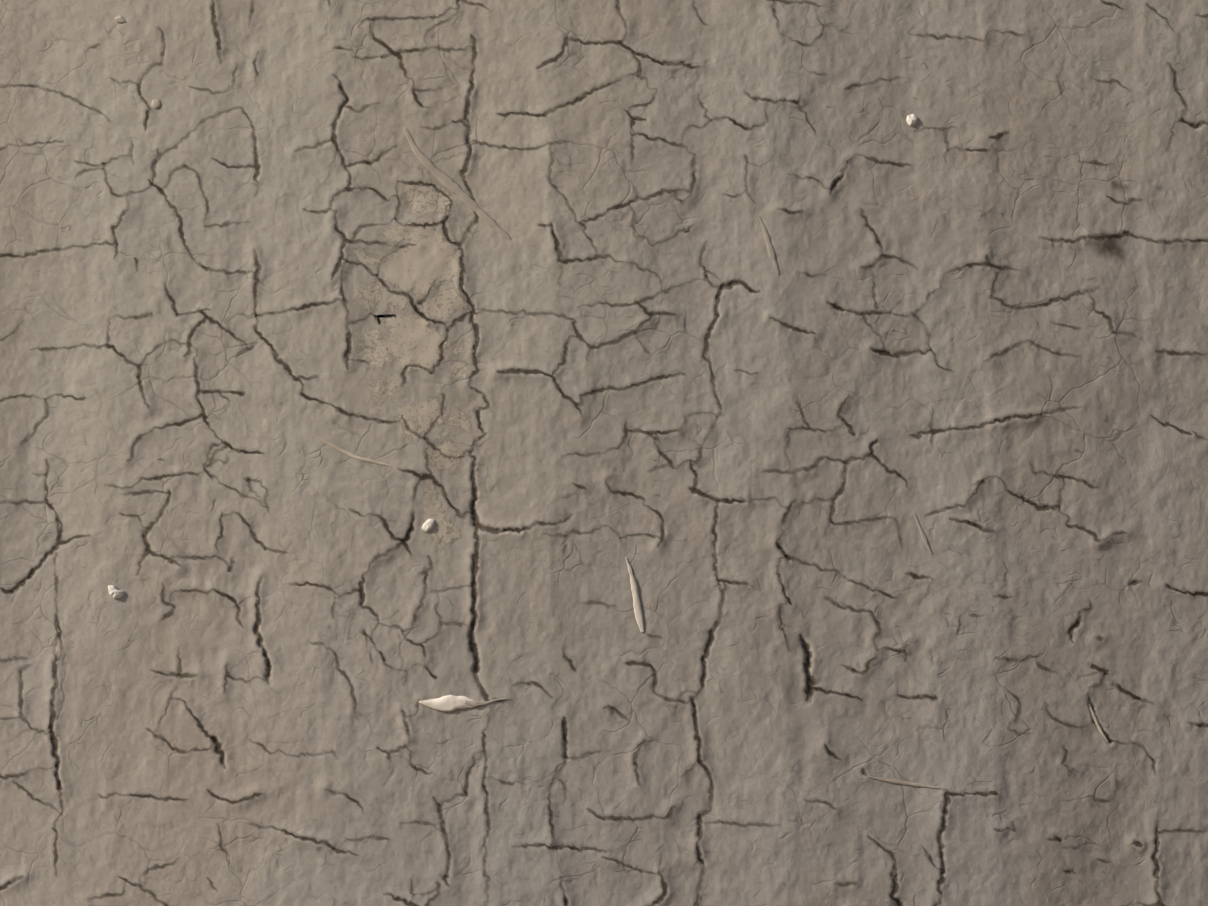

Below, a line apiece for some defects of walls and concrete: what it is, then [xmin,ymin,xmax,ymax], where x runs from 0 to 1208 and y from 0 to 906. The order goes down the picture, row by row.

crack [0,394,85,593]
peeling [349,180,482,546]
crack [664,227,758,409]
crack [911,407,1072,438]
crack [926,472,1125,541]
crack [956,255,1114,355]
crack [0,618,62,864]
crack [129,657,261,804]
crack [592,396,927,906]
crack [1014,603,1141,762]
crack [928,791,998,906]
crack [1135,827,1192,906]